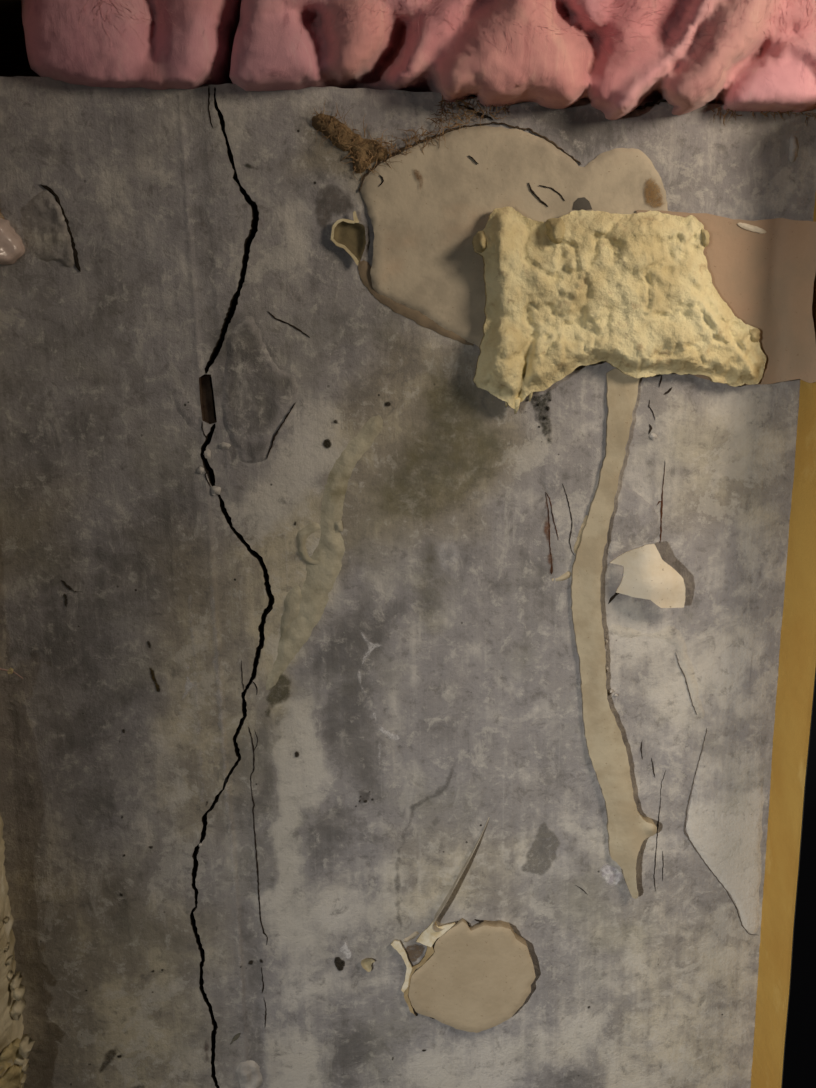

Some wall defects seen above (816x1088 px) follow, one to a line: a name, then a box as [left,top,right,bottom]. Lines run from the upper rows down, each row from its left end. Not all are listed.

peeling [316,188,366,265]
mould [525,391,551,441]
crack [190,87,275,1088]
peeling [607,487,685,608]
peeling [684,723,765,935]